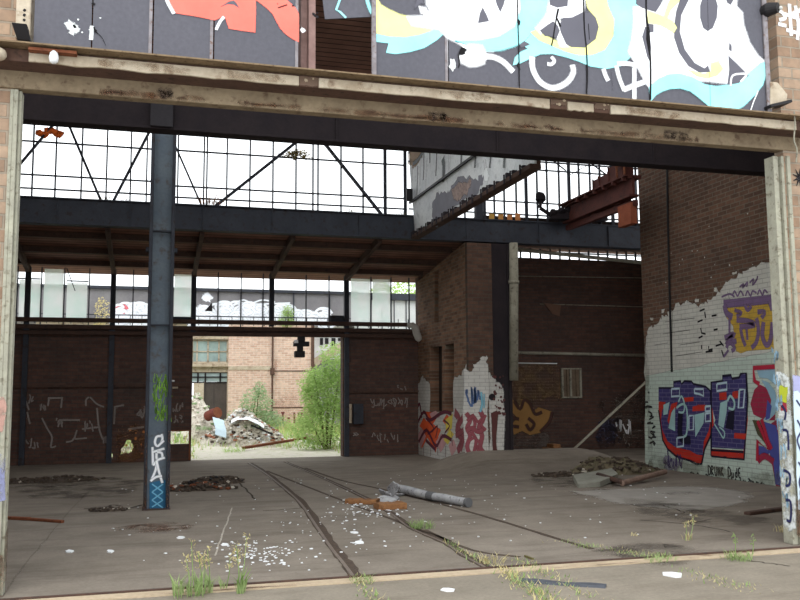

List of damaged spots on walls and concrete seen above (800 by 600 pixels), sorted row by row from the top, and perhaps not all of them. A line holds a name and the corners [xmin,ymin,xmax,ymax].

peeling [432,168,490,227]
peeling [418,356,505,459]
peeling [644,262,777,486]